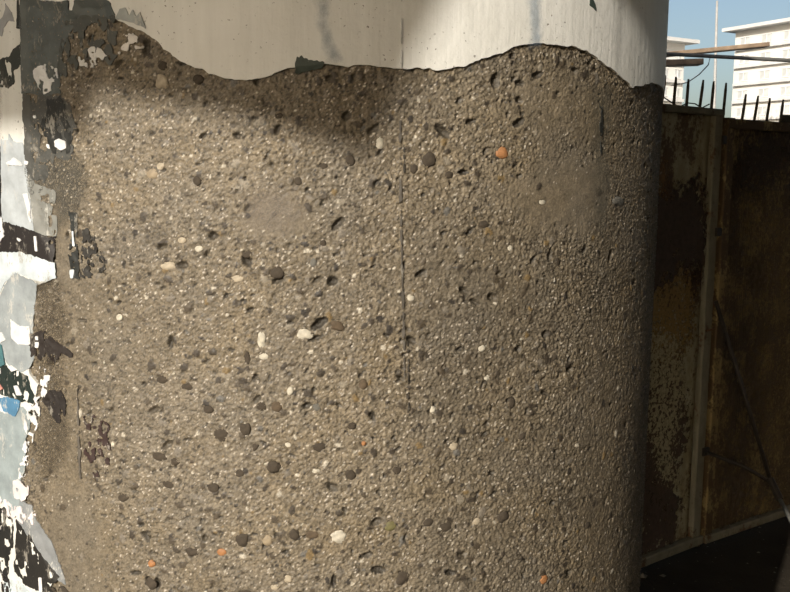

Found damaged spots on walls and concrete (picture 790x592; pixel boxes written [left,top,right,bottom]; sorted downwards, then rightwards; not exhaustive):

peeling [0,0,146,105]
peeling [6,158,29,166]
rust [654,144,708,313]
spalling [23,19,663,592]
peeling [0,332,18,374]
peeling [10,319,30,345]
peeling [642,323,692,555]
peeling [0,499,27,524]
peeling [13,479,29,502]